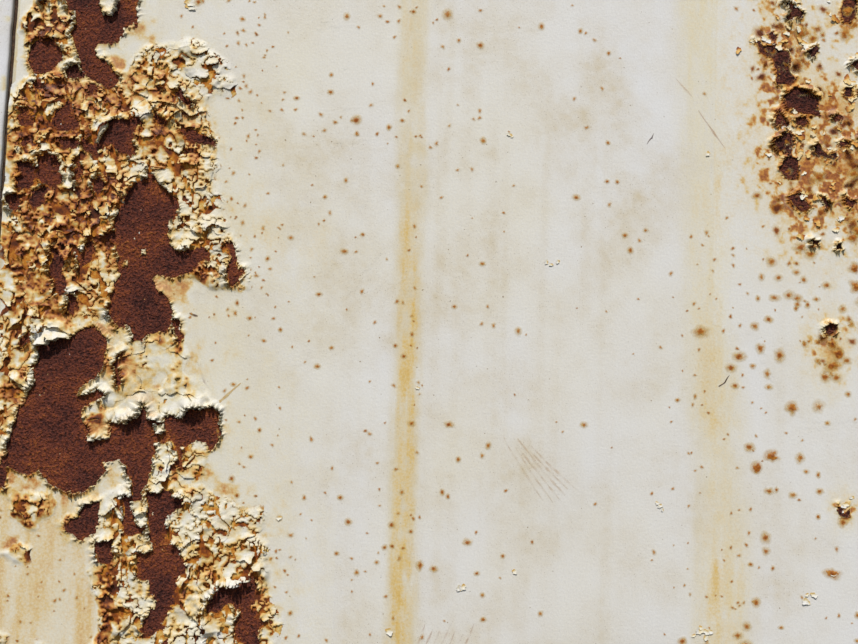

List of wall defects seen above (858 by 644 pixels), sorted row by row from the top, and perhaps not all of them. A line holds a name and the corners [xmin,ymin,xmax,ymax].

peeling [17,0,79,60]
peeling [0,35,256,452]
corrosion [0,0,364,644]
corrosion [369,0,451,644]
corrosion [702,0,858,434]
spalling [736,0,858,260]
peeling [0,476,50,570]
peeling [85,441,287,644]
corrosion [705,546,759,629]
corrosion [753,452,778,473]
corrosion [798,455,858,551]
spalling [832,496,857,525]